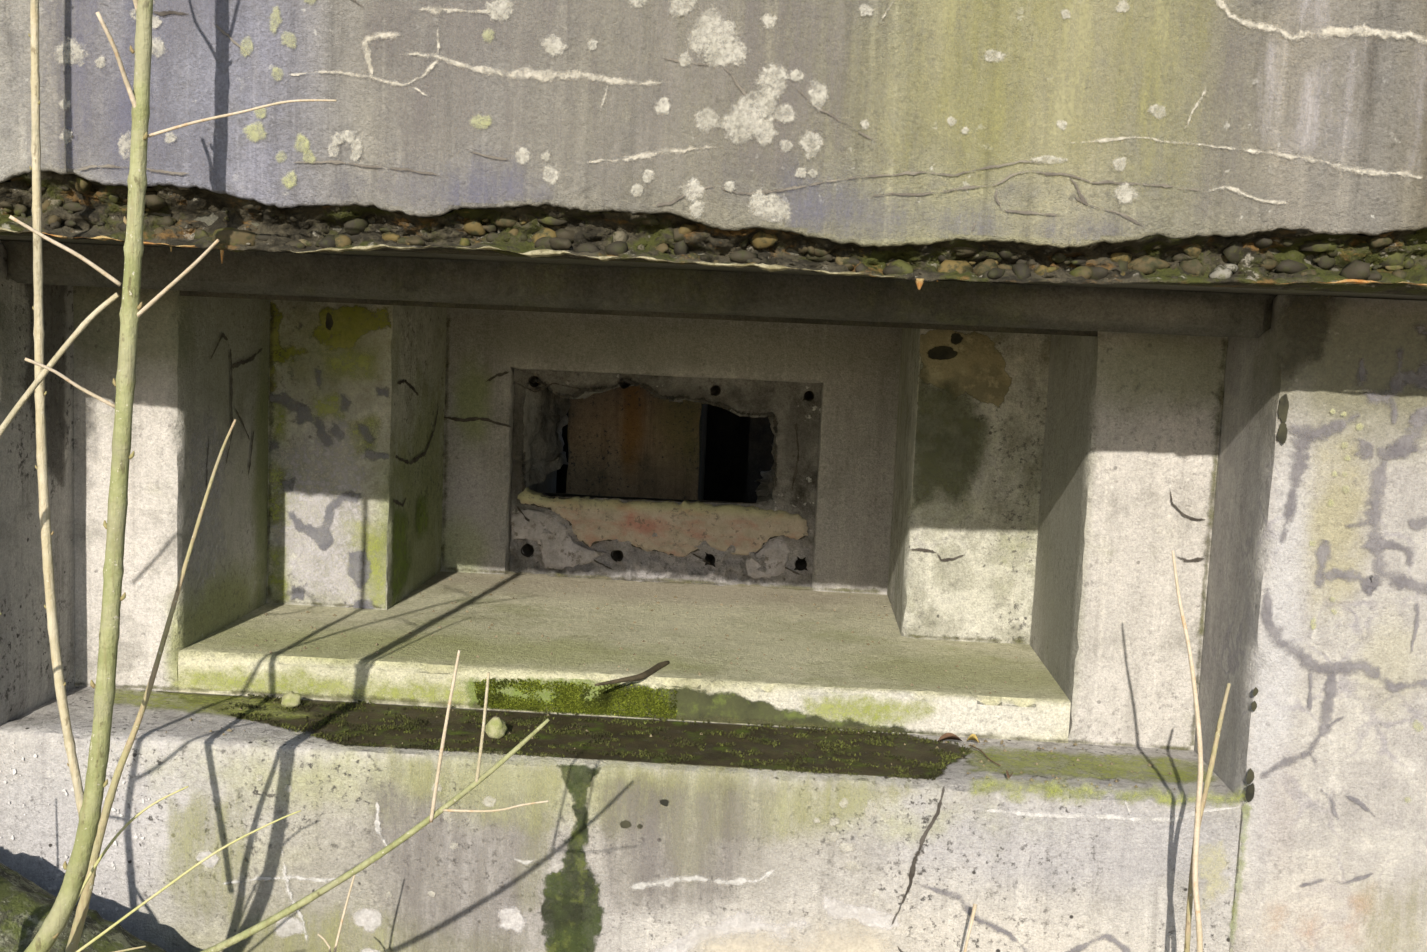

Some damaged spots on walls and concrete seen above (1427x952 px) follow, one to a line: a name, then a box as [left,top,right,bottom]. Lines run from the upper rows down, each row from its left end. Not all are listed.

leakage [110,78,132,160]
crack [291,0,658,105]
leakage [599,0,849,178]
crack [1188,92,1423,178]
crack [1216,0,1427,42]
spalling [0,171,1427,296]
leakage [1279,294,1336,374]
spalling [511,378,809,579]
leakage [912,367,987,505]
crack [987,325,1427,952]
leakage [114,671,1242,952]
crack [892,786,1016,952]